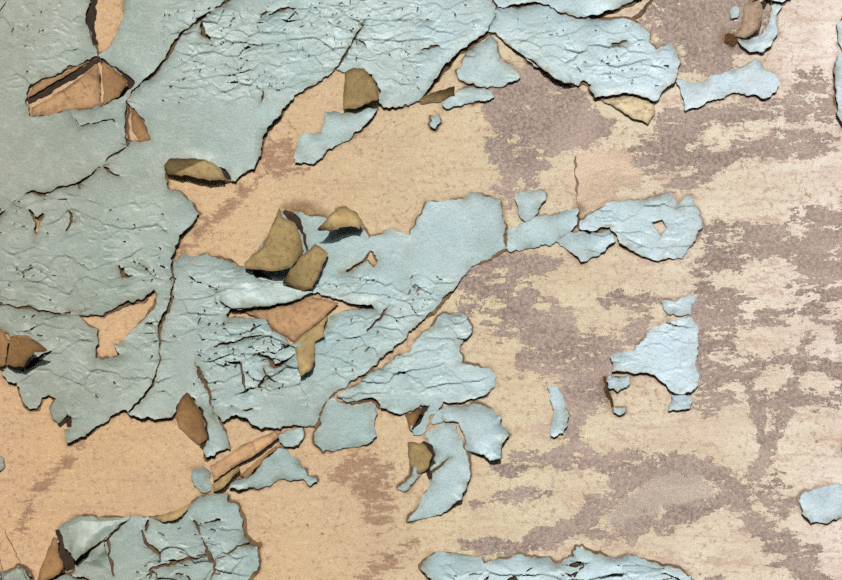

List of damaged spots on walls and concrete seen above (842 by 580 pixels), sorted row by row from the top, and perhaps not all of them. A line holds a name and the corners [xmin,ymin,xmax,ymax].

peeling [26,0,151,144]
crack [0,0,429,233]
crack [389,0,653,94]
peeling [585,0,671,49]
peeling [283,244,328,291]
peeling [0,329,48,367]
crack [119,247,176,412]
crack [193,285,295,413]
peeling [226,292,374,376]
crack [345,397,380,409]
peeling [0,368,220,580]
crack [0,516,250,580]